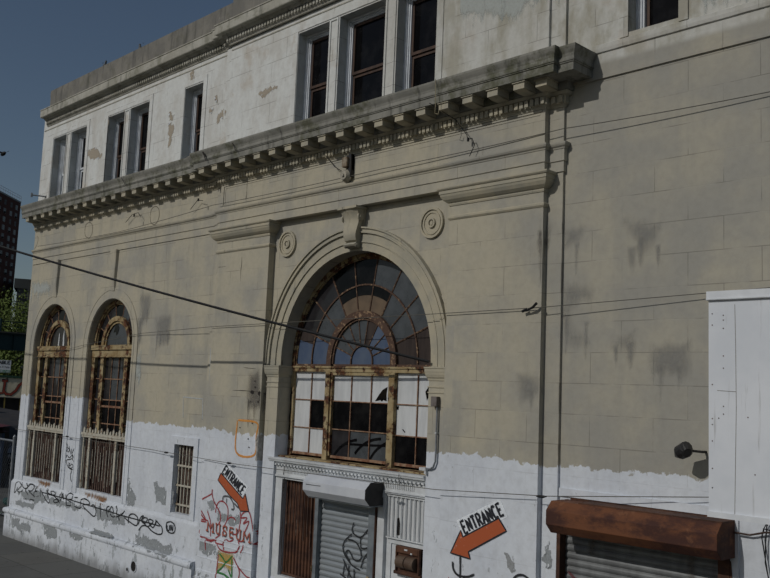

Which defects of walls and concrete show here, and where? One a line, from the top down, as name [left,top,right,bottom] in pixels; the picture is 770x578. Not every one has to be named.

peeling [126,478,136,506]
peeling [12,517,30,532]
peeling [16,489,125,541]
peeling [132,534,173,558]